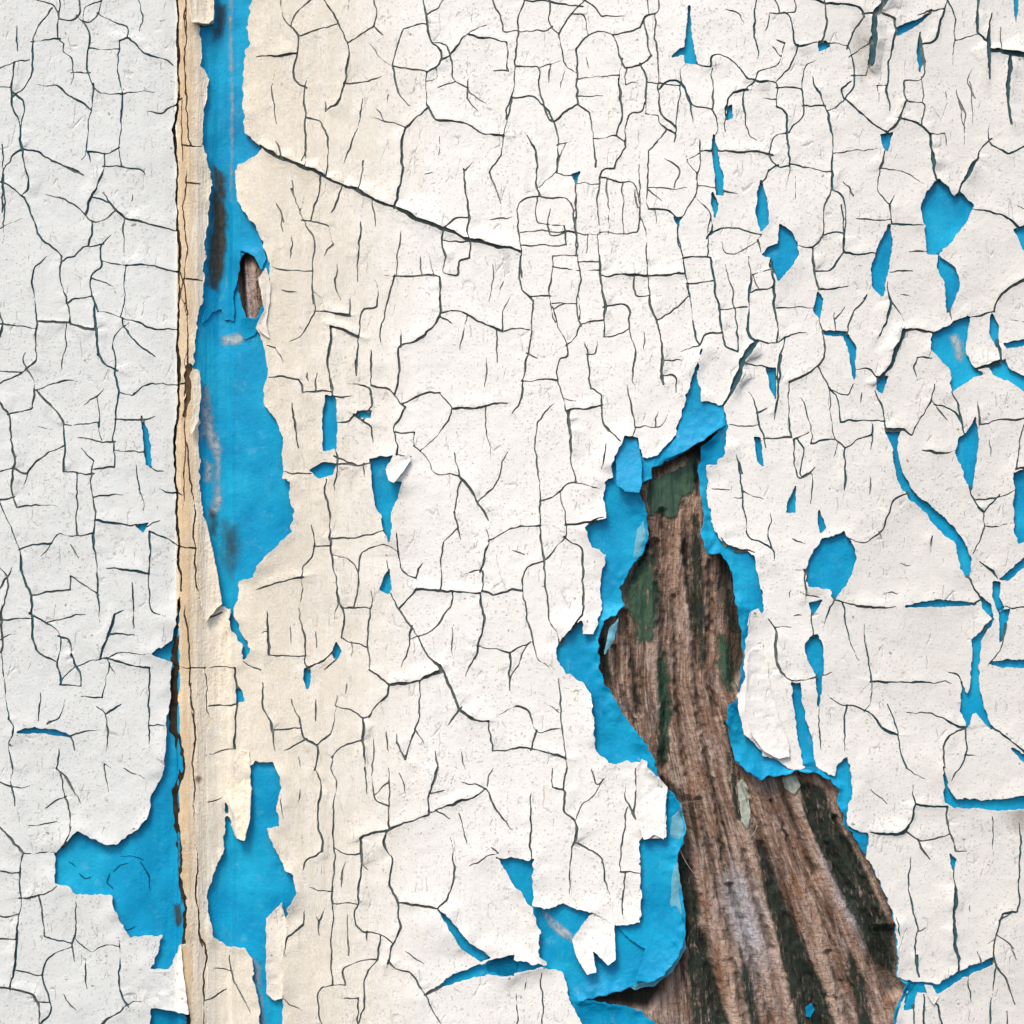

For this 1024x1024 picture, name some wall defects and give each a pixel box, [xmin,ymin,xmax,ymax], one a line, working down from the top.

peeling [55,608,189,1024]
crack [0,0,261,1024]
peeling [189,0,294,660]
peeling [207,751,296,1024]
peeling [369,455,411,542]
crack [256,0,1024,1024]
peeling [429,349,993,1024]
peeling [755,180,799,281]
peeling [921,179,1024,393]